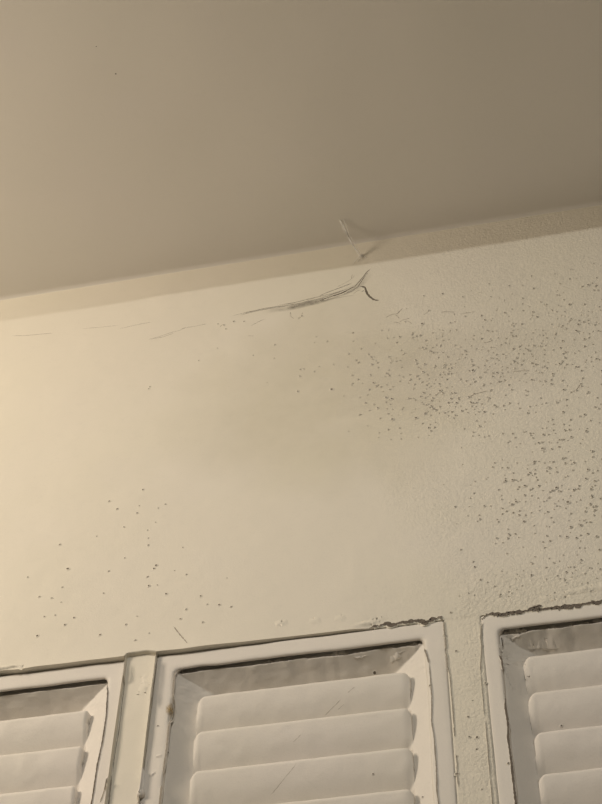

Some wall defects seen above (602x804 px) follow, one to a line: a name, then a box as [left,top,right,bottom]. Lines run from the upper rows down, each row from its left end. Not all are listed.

crack [239,269,473,324]